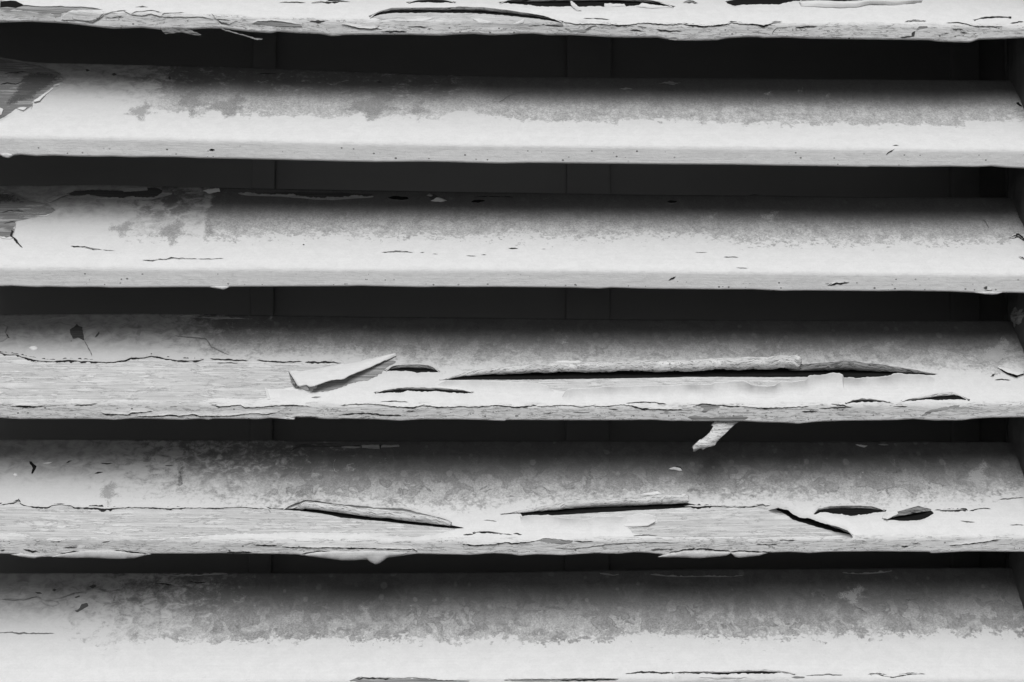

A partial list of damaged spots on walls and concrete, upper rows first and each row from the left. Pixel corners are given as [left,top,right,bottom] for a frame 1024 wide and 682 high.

peeling [0,0,124,23]
peeling [253,18,324,27]
peeling [369,0,675,33]
peeling [725,0,923,11]
peeling [973,12,1011,26]
peeling [0,57,66,123]
crack [0,335,337,364]
peeling [0,317,473,406]
crack [0,499,272,512]
peeling [0,497,522,546]
peeling [768,499,934,537]